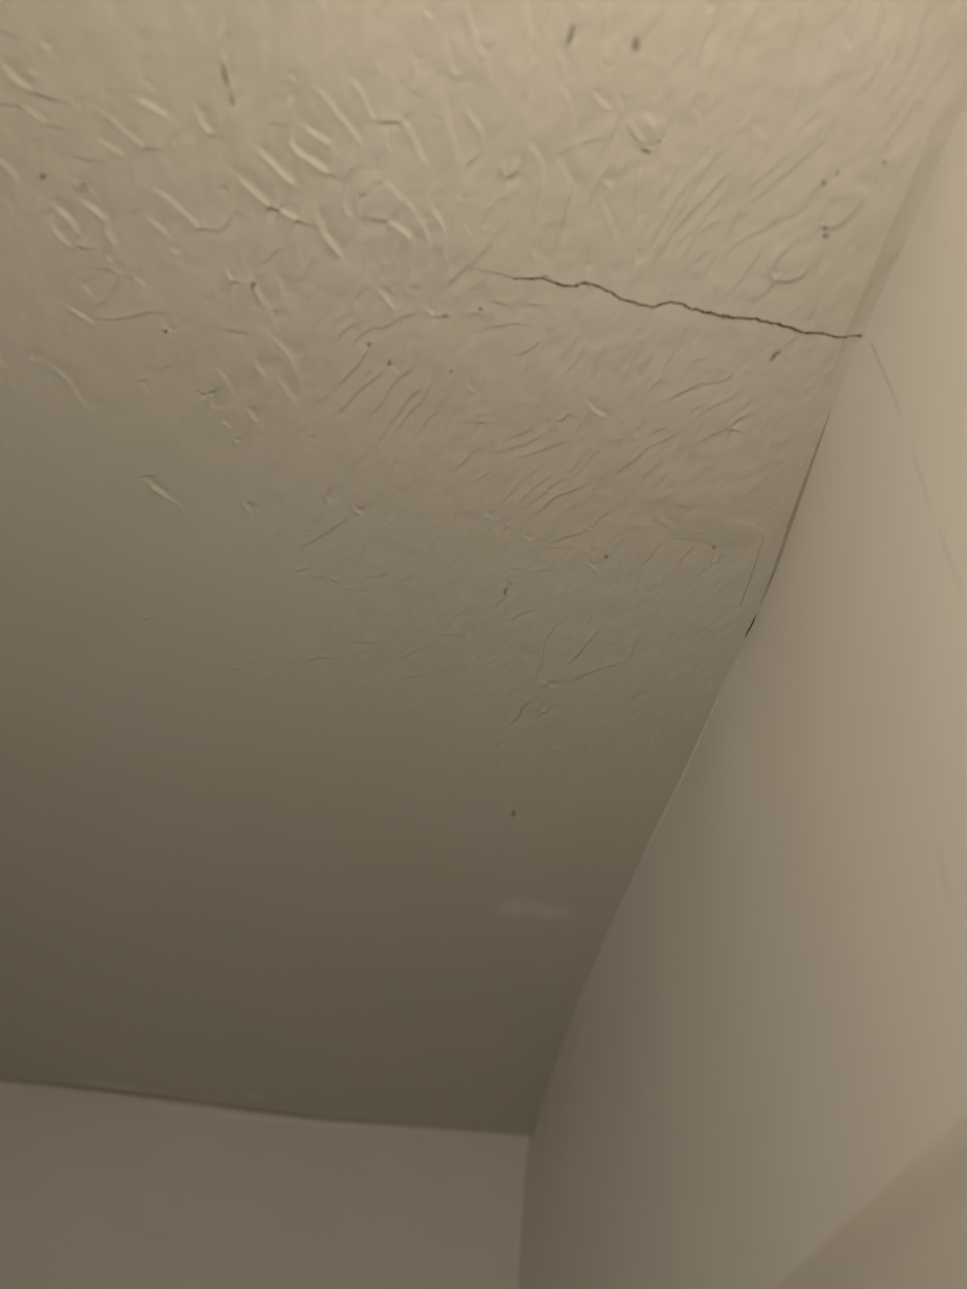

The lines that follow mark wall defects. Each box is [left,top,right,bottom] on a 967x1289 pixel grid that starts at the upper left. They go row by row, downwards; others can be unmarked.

crack [470,266,862,338]